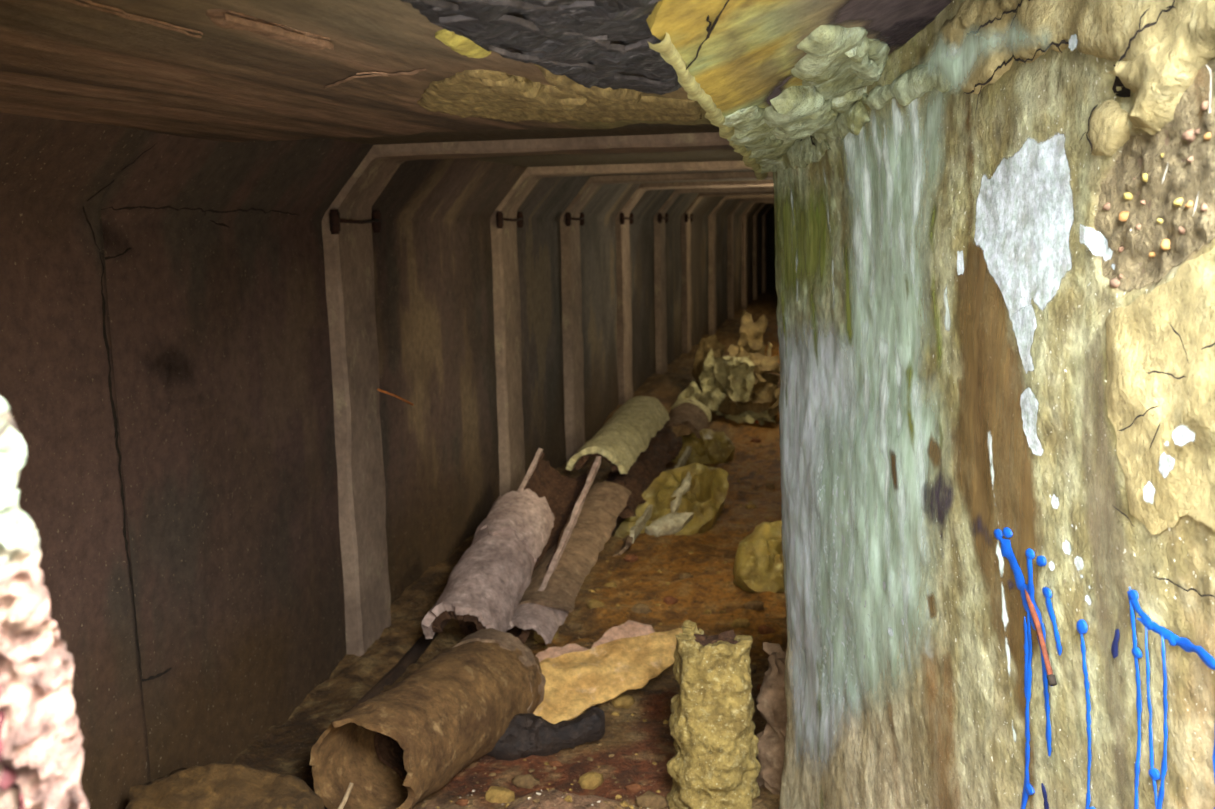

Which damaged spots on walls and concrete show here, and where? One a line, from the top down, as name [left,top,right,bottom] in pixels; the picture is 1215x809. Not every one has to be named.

spalling [400,0,768,180]
leakage [930,30,1024,86]
crack [963,0,1069,120]
crack [1117,0,1176,68]
crack [82,147,300,688]
leakage [779,97,950,756]
crack [0,675,25,809]